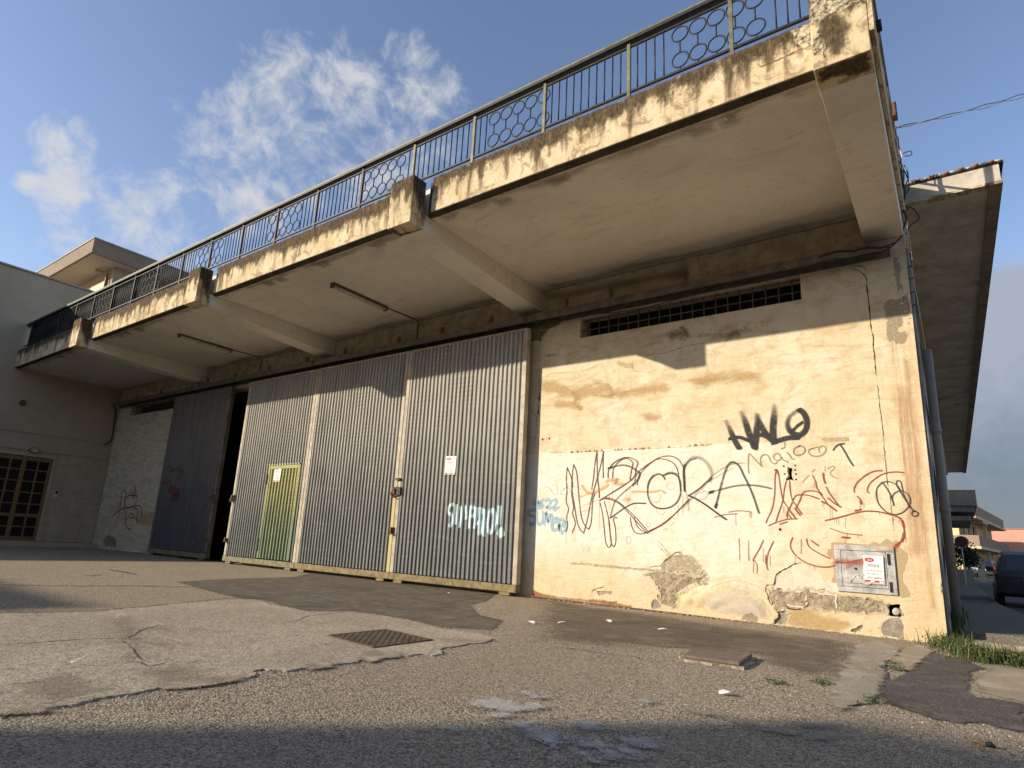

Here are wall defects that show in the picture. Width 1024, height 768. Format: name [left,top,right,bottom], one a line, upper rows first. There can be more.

water stain [18,2,871,357]
water stain [541,383,667,409]
crack [853,265,894,526]
flaking render [570,553,709,610]
flaking render [766,587,903,634]